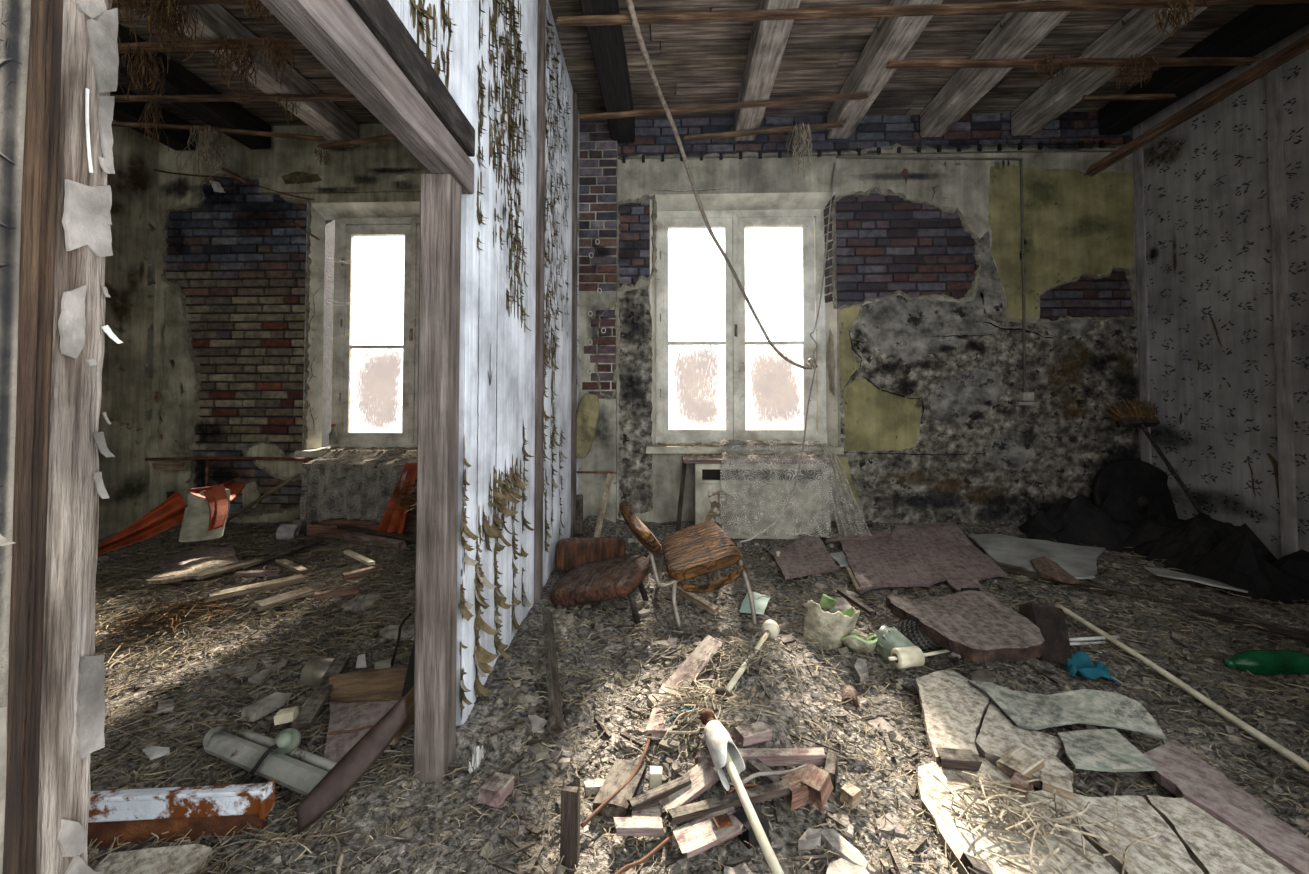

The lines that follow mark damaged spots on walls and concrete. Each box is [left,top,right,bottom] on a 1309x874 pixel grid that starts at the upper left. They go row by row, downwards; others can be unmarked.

crack [0,19,22,112]
flaking render [146,171,322,519]
peeling [522,387,568,488]
flaking render [544,56,1141,528]
peeling [459,468,565,705]